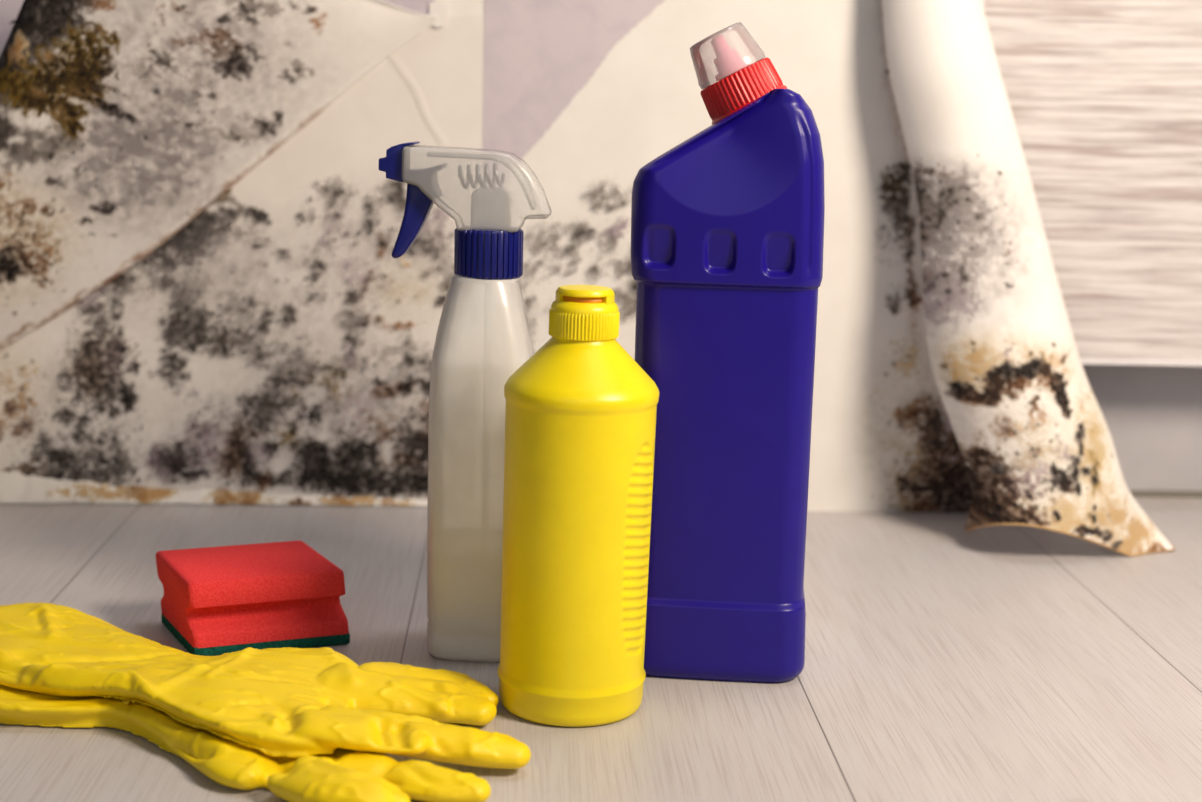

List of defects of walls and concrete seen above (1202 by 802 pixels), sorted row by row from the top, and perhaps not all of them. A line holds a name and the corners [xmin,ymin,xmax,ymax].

peeling [0,0,438,350]
water stain [0,177,454,500]
water stain [519,181,637,352]
water stain [877,162,1018,380]
water stain [882,393,1167,554]
peeling [1049,422,1099,496]
peeling [1074,505,1122,549]